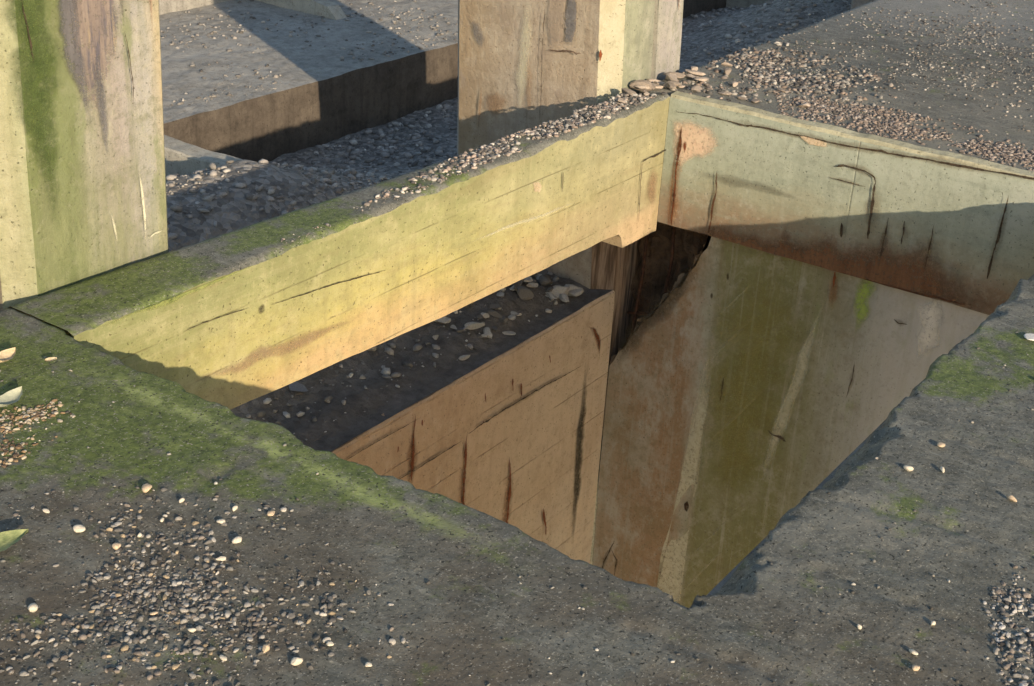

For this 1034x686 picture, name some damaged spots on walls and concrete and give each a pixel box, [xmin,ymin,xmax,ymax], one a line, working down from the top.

damp [59,0,108,143]
corrosion [671,126,686,225]
crack [680,112,1034,279]
corrosion [411,416,423,480]
damp [574,391,586,519]